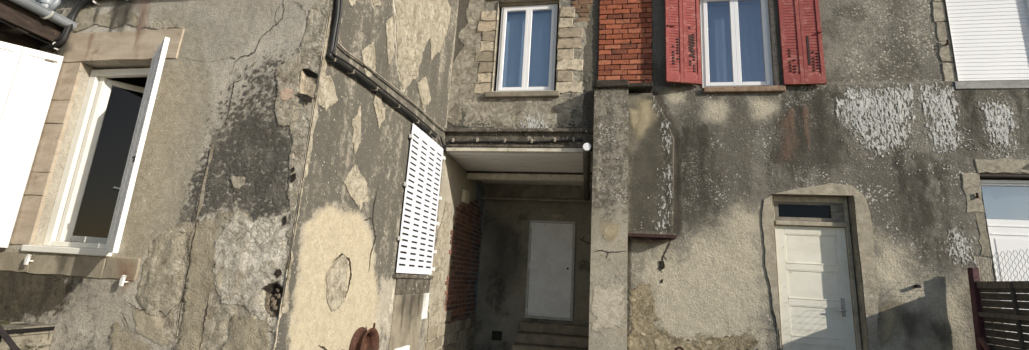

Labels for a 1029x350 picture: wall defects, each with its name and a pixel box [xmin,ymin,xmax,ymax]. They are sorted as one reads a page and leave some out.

peeling [362,0,593,128]
crack [122,0,306,350]
spalling [155,0,338,350]
peeling [344,87,385,211]
efflorescence [833,82,1019,175]
peeling [326,254,349,312]
spalling [441,197,482,334]